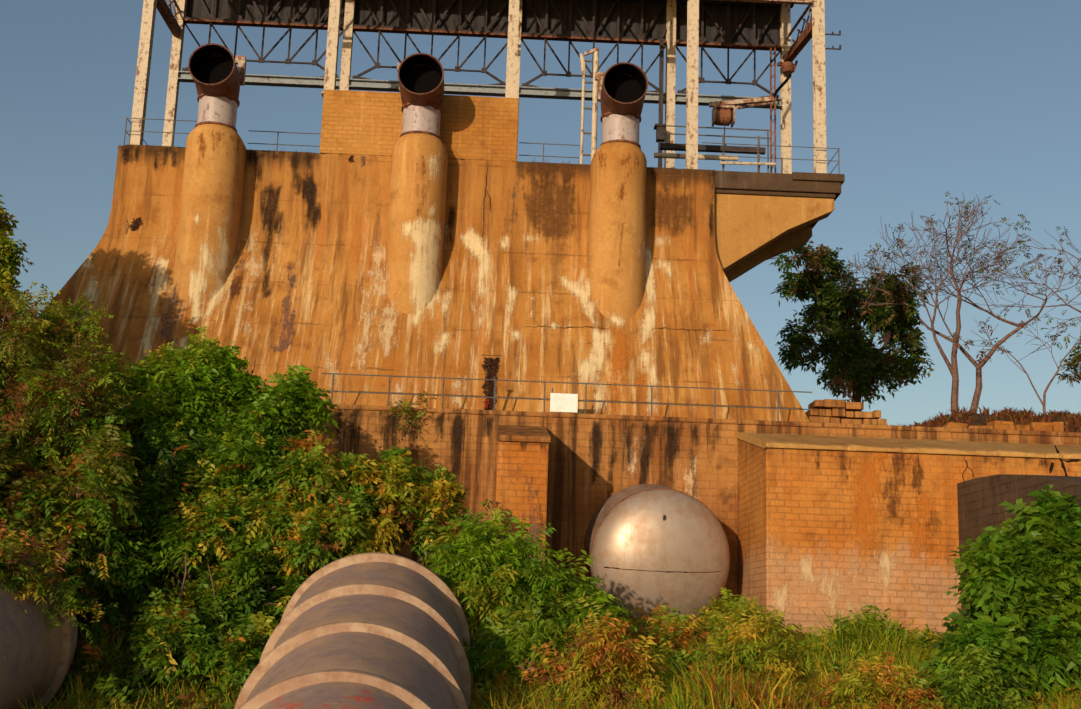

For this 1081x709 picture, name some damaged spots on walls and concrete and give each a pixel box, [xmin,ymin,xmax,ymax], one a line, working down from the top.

leakage [291,152,321,227]
leakage [509,161,575,240]
leakage [141,187,282,358]
leakage [271,266,295,352]
leakage [353,247,397,369]
leakage [402,208,491,352]
leakage [506,287,520,339]
leakage [562,169,692,492]
leakage [380,380,419,462]
leakage [435,376,467,475]
leakage [683,457,697,498]
leakage [884,453,923,522]